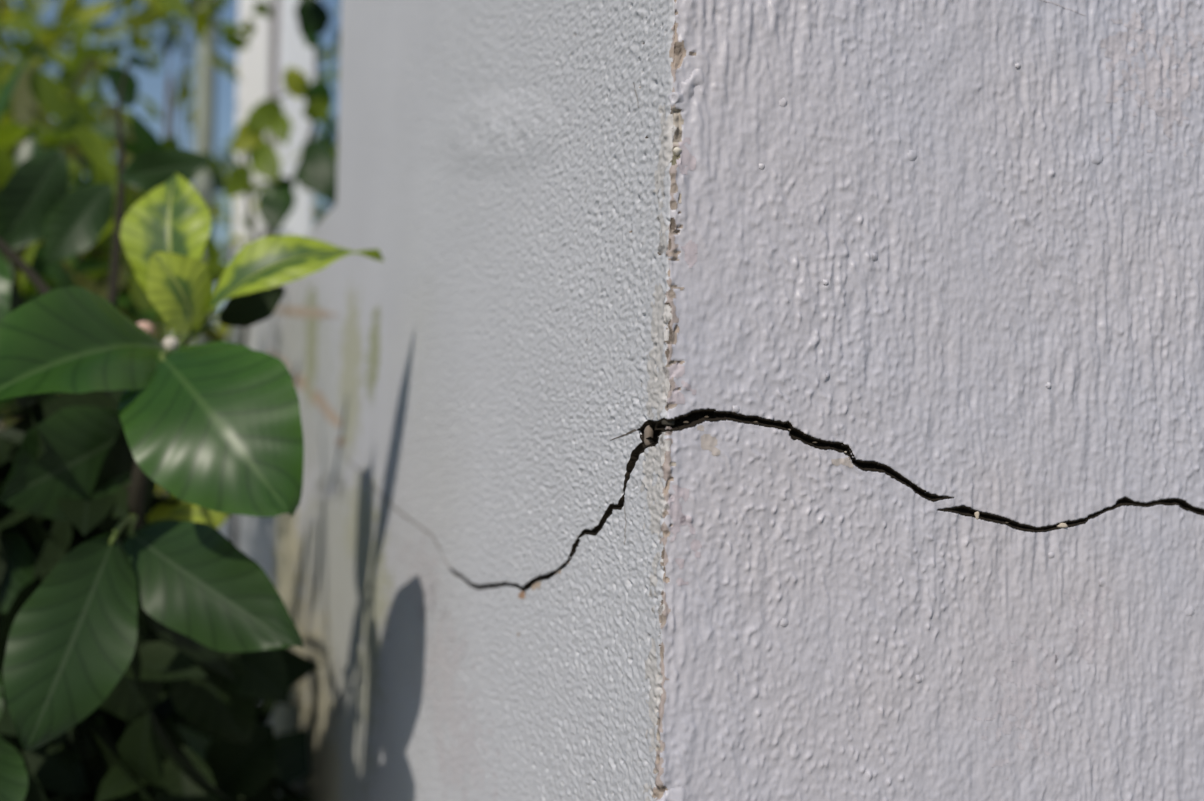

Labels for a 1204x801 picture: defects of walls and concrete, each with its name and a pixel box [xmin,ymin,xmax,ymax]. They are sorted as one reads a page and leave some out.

crack [449,408,1204,591]